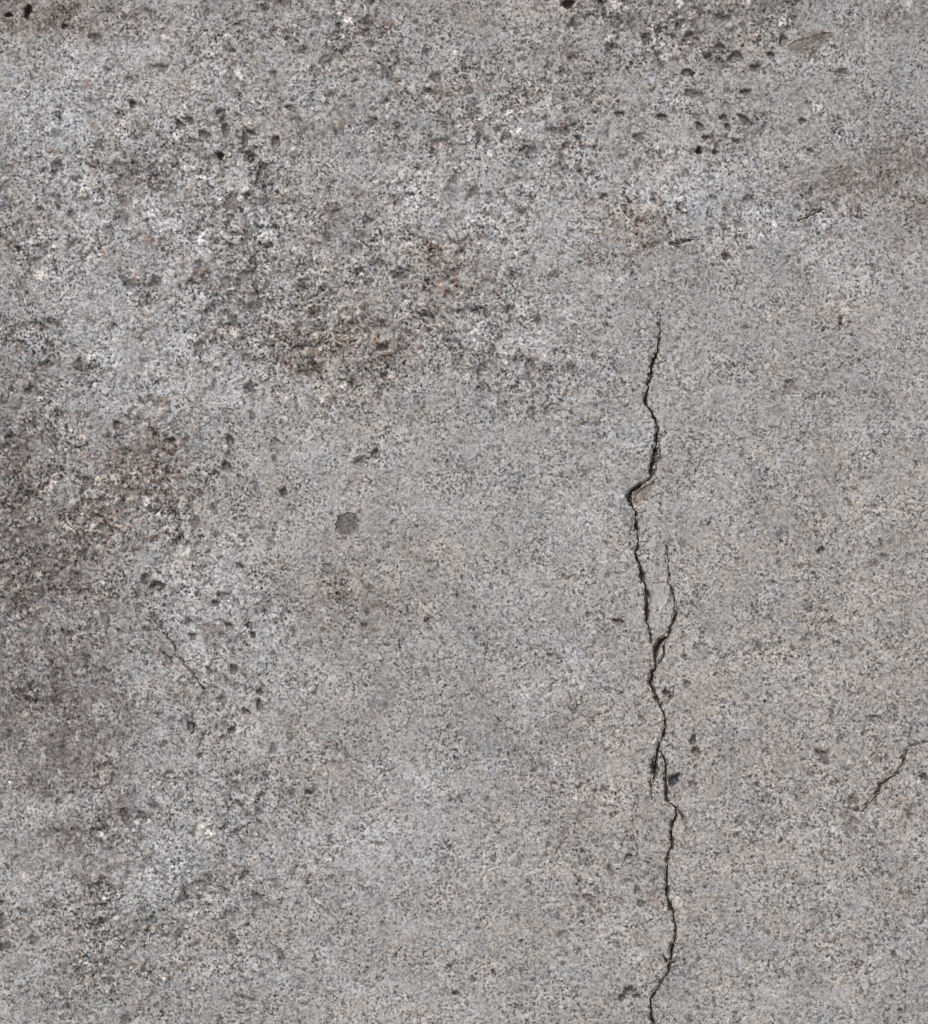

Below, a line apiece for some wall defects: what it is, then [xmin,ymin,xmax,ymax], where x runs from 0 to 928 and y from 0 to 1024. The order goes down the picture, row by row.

crack [621,313,688,1024]
crack [850,738,928,812]